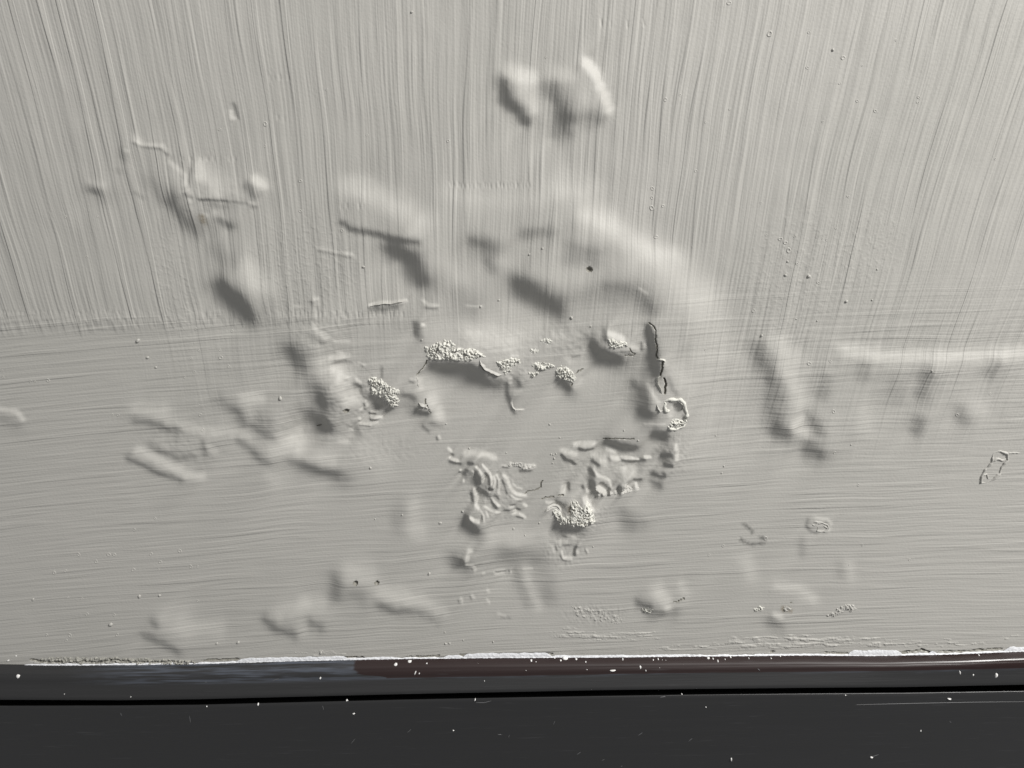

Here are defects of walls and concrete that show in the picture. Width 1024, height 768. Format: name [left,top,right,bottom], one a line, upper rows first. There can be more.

peeling [425,338,576,382]
crack [625,322,667,395]
peeling [368,377,400,408]
spalling [656,376,689,431]
spalling [542,499,596,573]